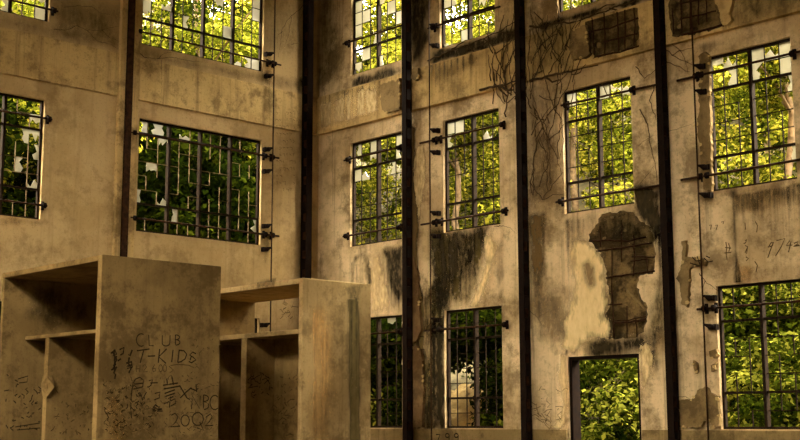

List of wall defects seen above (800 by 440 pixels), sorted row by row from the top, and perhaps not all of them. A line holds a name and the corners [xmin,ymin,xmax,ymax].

damp [431,30,514,73]
spalling [569,8,639,61]
spalling [668,0,735,37]
damp [412,126,425,270]
damp [601,184,661,249]
damp [354,247,402,310]
spalling [589,210,656,340]
flaking render [676,240,708,308]
damp [416,227,501,429]
damp [529,213,664,428]
flaking render [679,387,722,430]